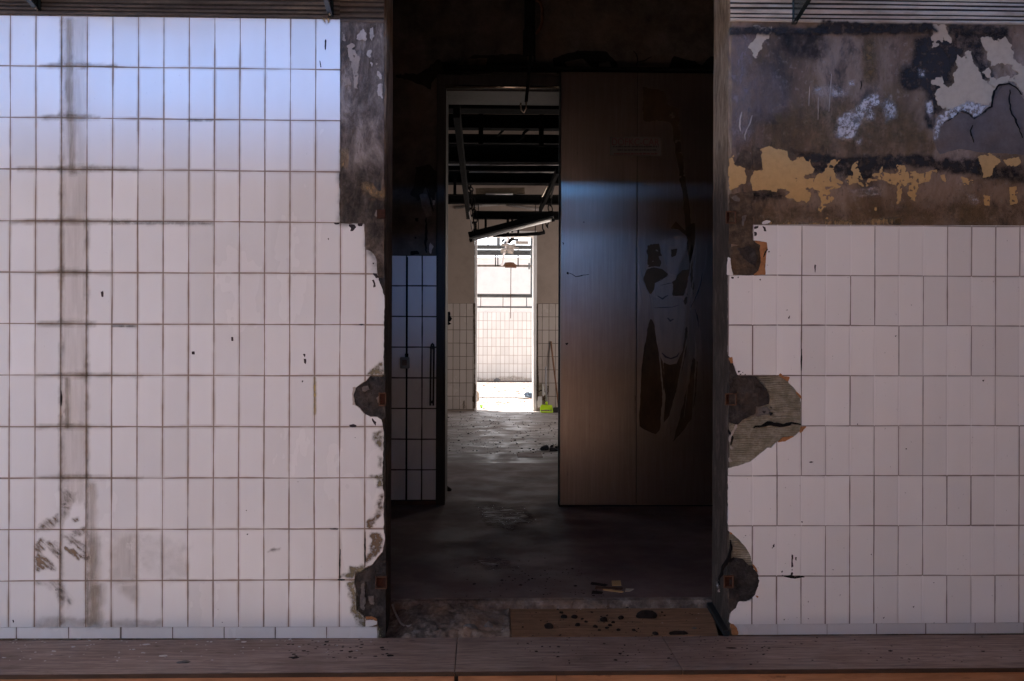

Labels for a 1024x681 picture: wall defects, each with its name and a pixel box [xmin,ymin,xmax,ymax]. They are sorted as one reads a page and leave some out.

spalling [334,22,385,299]
peeling [748,25,772,58]
peeling [727,112,946,280]
water stain [753,191,997,225]
water stain [729,20,1024,182]
peeling [931,24,952,48]
spalling [931,36,1024,185]
spalling [728,357,806,467]
spalling [352,334,511,642]
spalling [728,532,759,635]